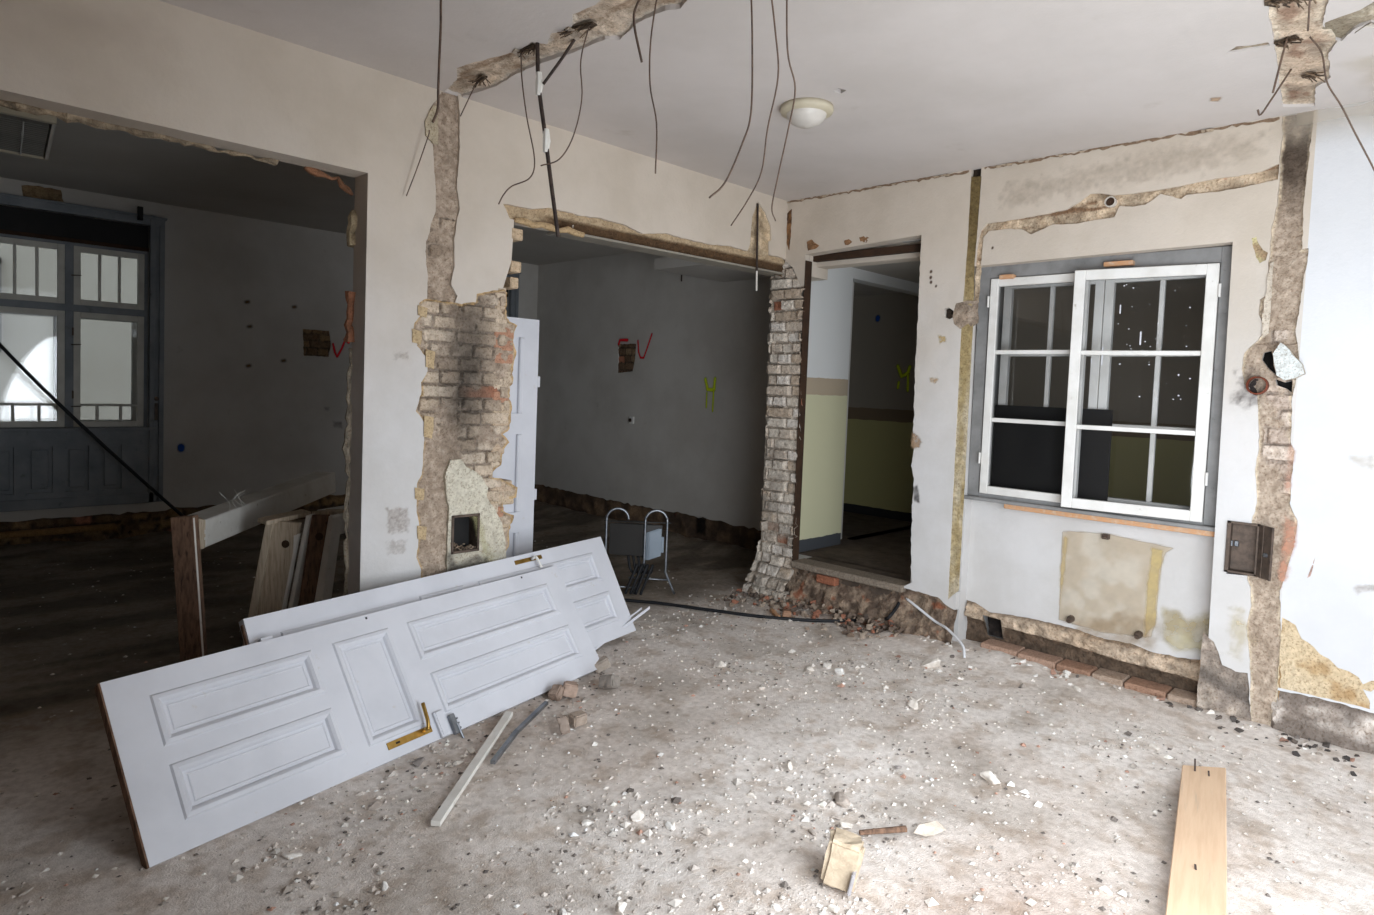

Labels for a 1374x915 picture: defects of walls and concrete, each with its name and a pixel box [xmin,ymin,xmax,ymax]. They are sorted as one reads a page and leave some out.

flaking render [1322,2,1374,38]
flaking render [425,105,438,145]
flaking render [503,204,819,277]
flaking render [1252,237,1268,263]
spalling [1263,351,1292,392]
flaking render [412,261,761,578]
flaking render [784,531,1251,721]
flaking render [1271,618,1374,754]